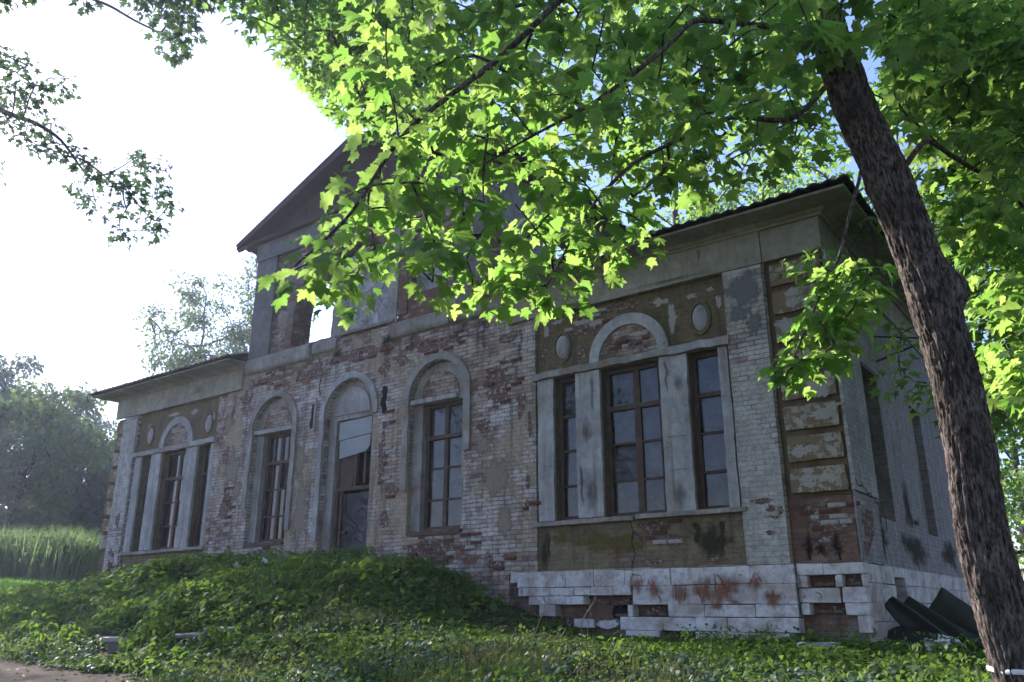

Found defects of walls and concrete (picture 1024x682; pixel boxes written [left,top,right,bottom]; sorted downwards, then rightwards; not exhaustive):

peeling [541,297,678,362]
peeling [476,357,532,437]
peeling [802,370,843,420]
peeling [213,367,286,532]
peeling [749,437,875,560]
spalling [486,553,516,570]
damp [692,522,726,558]
damp [902,489,926,565]
damp [942,544,956,569]
corrosion [630,574,661,602]
corrosion [675,573,762,608]
corrosion [766,591,779,605]